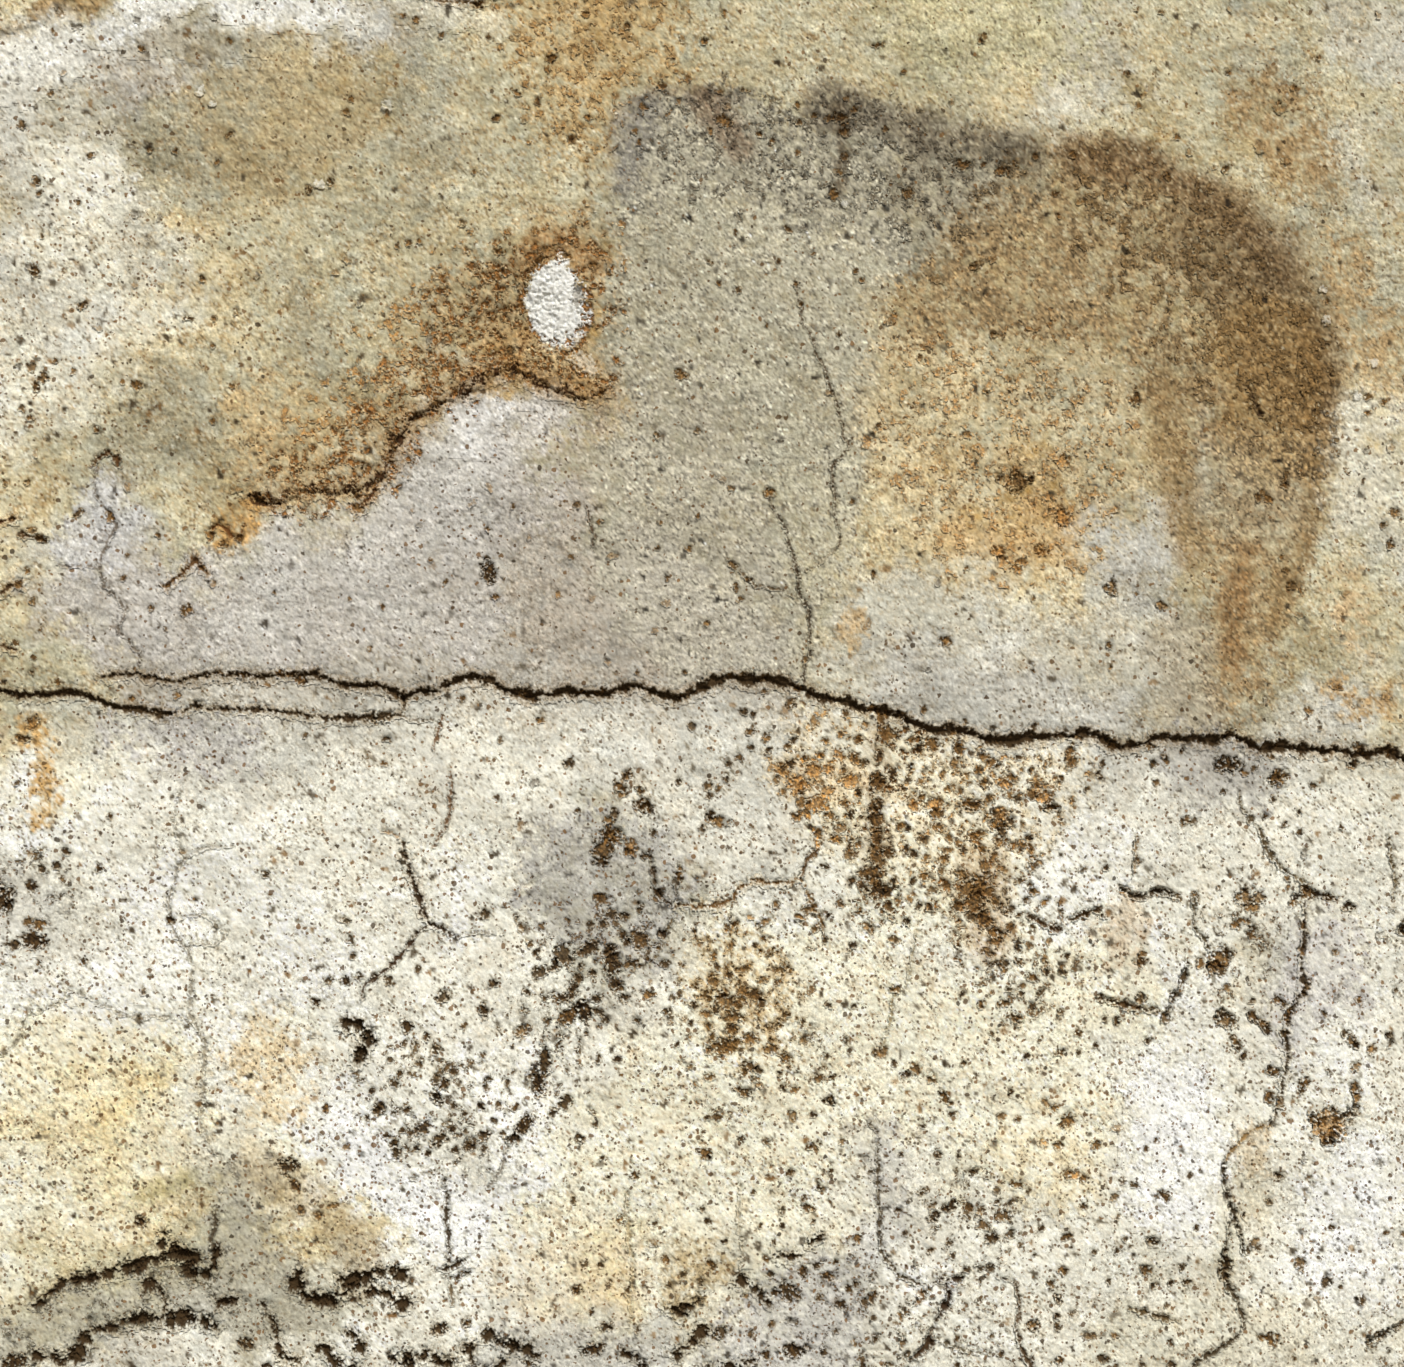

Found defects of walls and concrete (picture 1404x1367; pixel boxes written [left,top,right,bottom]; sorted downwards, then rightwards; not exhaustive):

spalling [24,261,41,279]
spalling [14,356,77,392]
flaking render [8,370,593,702]
spalling [304,177,335,194]
spalling [394,237,423,250]
rust [203,196,641,558]
spalling [499,226,615,399]
damp [499,0,1404,827]
crack [0,277,1404,1367]
rust [756,692,1109,972]